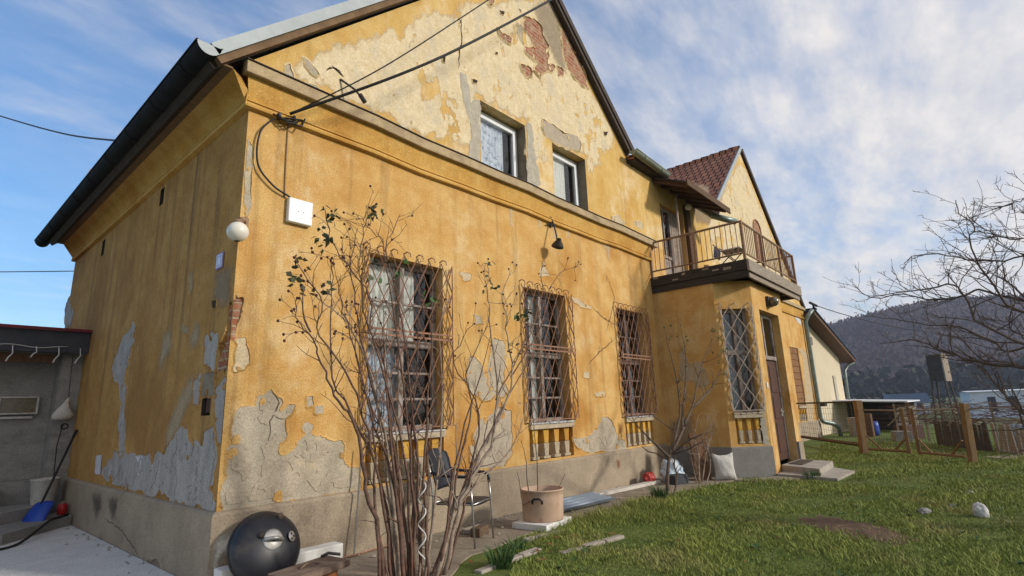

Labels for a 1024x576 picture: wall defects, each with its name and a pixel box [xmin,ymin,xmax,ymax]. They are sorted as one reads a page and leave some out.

peeling [283,0,613,186]
peeling [95,294,363,512]
peeling [465,336,513,470]
peeling [572,415,627,454]